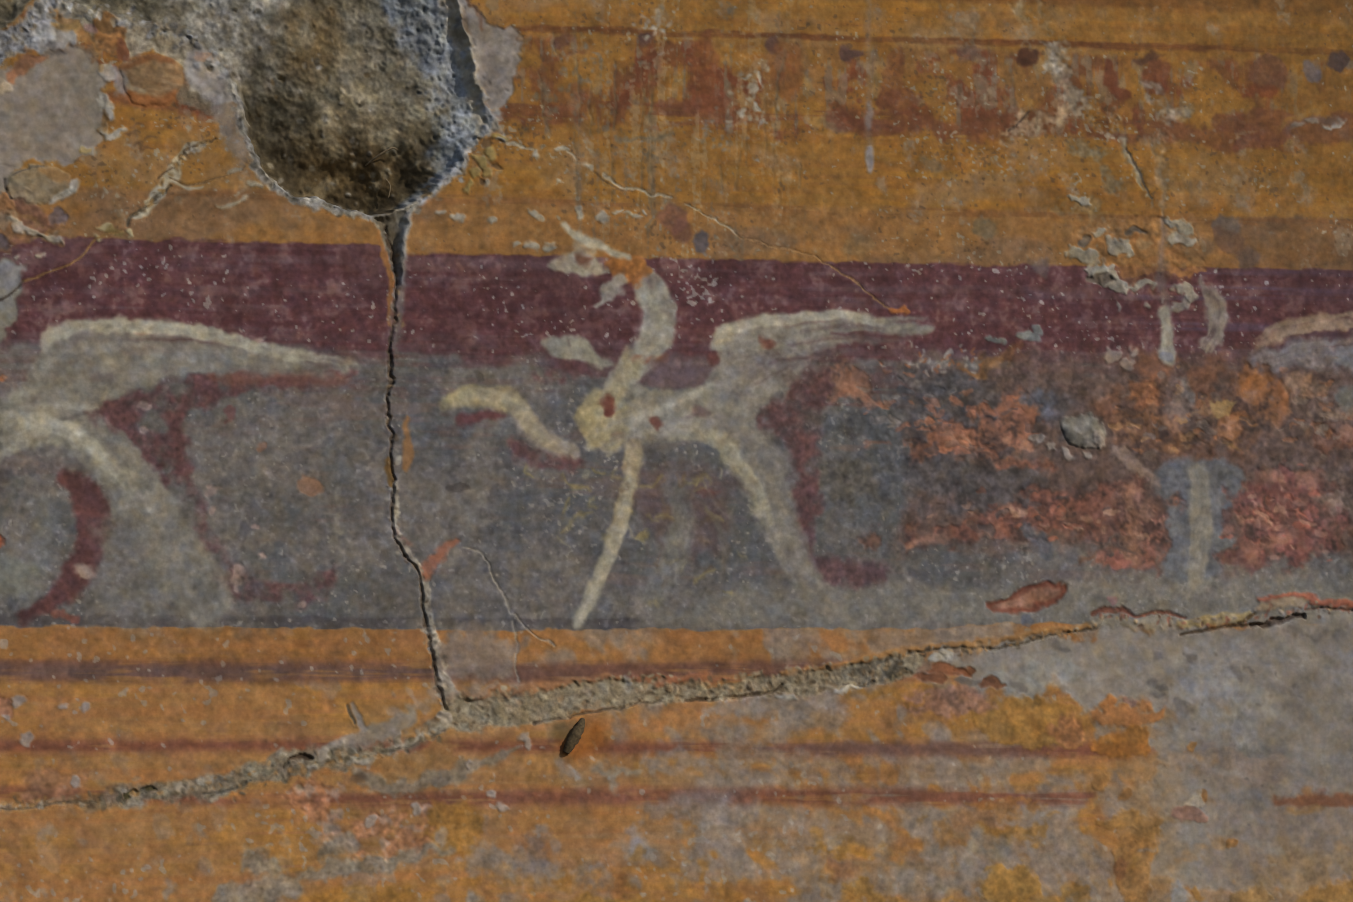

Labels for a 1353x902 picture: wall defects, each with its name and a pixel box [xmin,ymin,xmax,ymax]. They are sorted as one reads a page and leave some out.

crack [0,137,263,303]
spalling [0,0,523,338]
crack [506,140,911,316]
peeling [1103,344,1137,371]
spalling [910,385,1050,469]
spalling [1114,372,1291,468]
spalling [1306,417,1353,452]
peeling [227,550,267,590]
crack [0,199,1353,812]
spalling [911,480,1187,574]
spalling [1218,469,1353,572]
flaking render [922,613,1353,902]